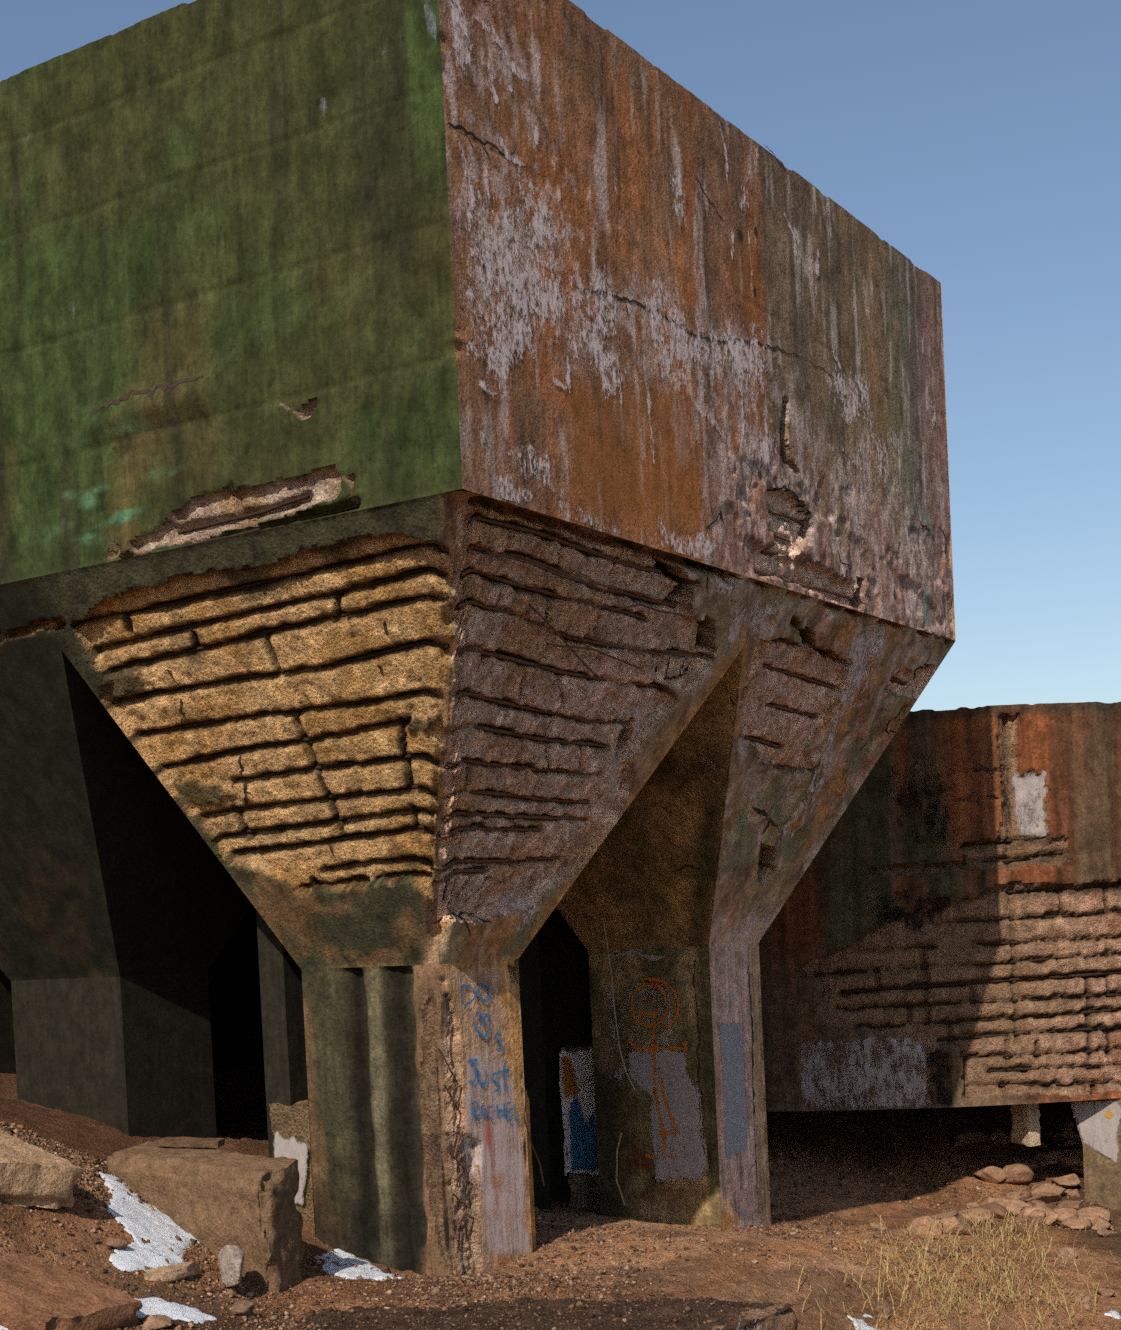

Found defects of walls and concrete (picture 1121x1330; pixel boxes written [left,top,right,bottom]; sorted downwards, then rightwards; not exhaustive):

efflorescence [424,0,536,104]
crack [448,122,528,168]
efflorescence [670,168,685,223]
efflorescence [456,133,626,408]
efflorescence [643,276,777,478]
crack [576,287,851,398]
water stain [496,445,616,532]
spalling [779,400,800,475]
spalling [752,480,865,614]
spalling [0,498,717,926]
spalling [757,841,776,885]
spalling [794,712,1121,1099]